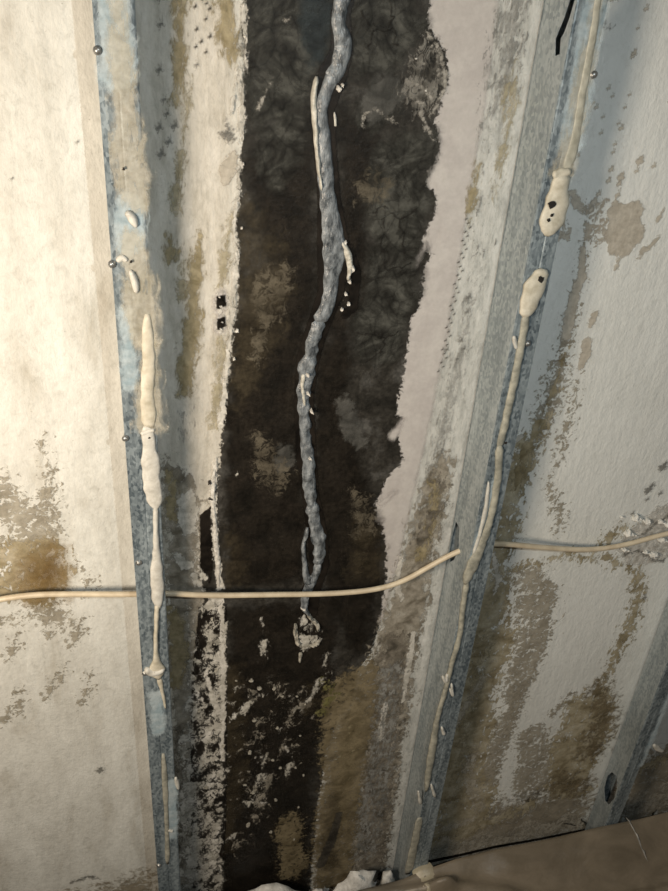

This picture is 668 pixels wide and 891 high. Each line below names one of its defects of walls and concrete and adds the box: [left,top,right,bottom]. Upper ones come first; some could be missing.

mould [480,0,531,179]
damp [0,432,102,664]
damp [156,0,460,891]
damp [428,156,660,866]
damp [0,661,97,724]
damp [618,744,668,823]
damp [66,869,158,891]